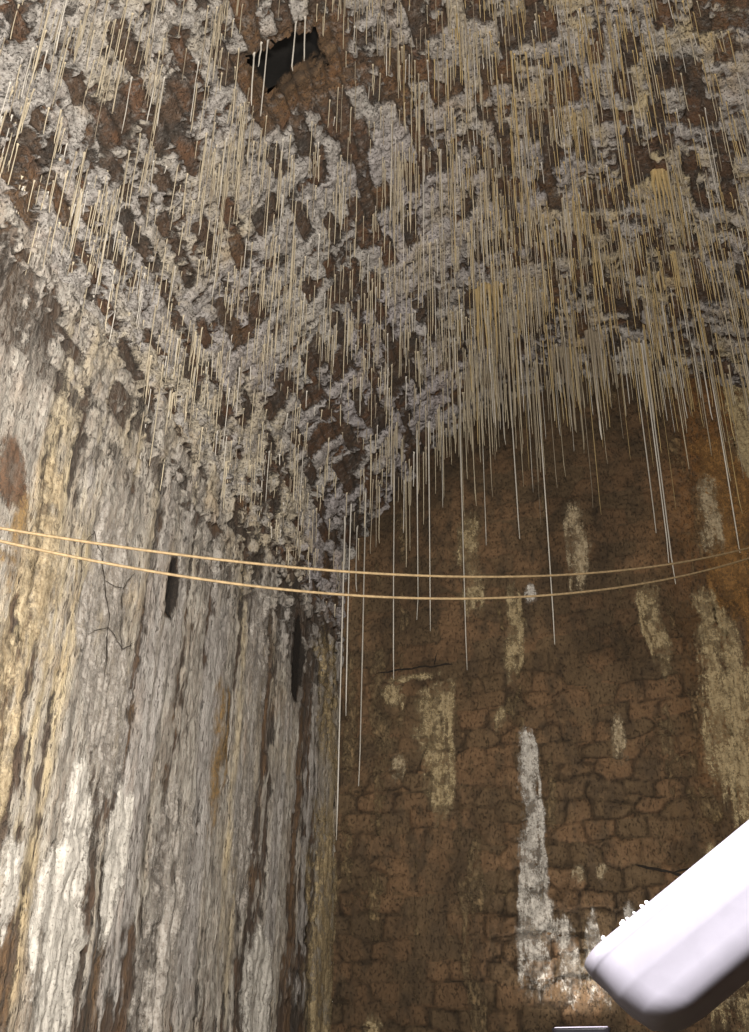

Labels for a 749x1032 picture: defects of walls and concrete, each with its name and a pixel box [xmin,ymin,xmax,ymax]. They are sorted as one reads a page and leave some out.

spalling [245,31,338,105]
leakage [724,385,749,478]
spalling [0,437,29,509]
leakage [698,477,725,548]
leakage [613,718,626,759]
leakage [695,587,749,828]
leakage [517,727,601,1005]
leakage [711,981,749,1024]